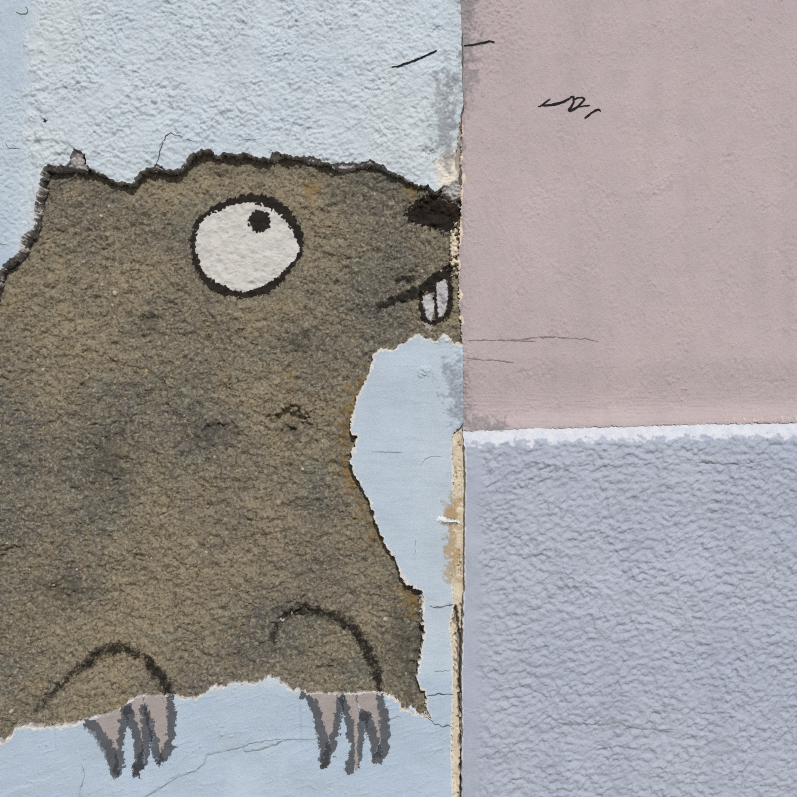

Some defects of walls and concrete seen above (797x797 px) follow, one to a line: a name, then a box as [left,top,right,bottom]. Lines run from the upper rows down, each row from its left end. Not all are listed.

spalling [0,148,462,745]
crack [146,739,313,797]